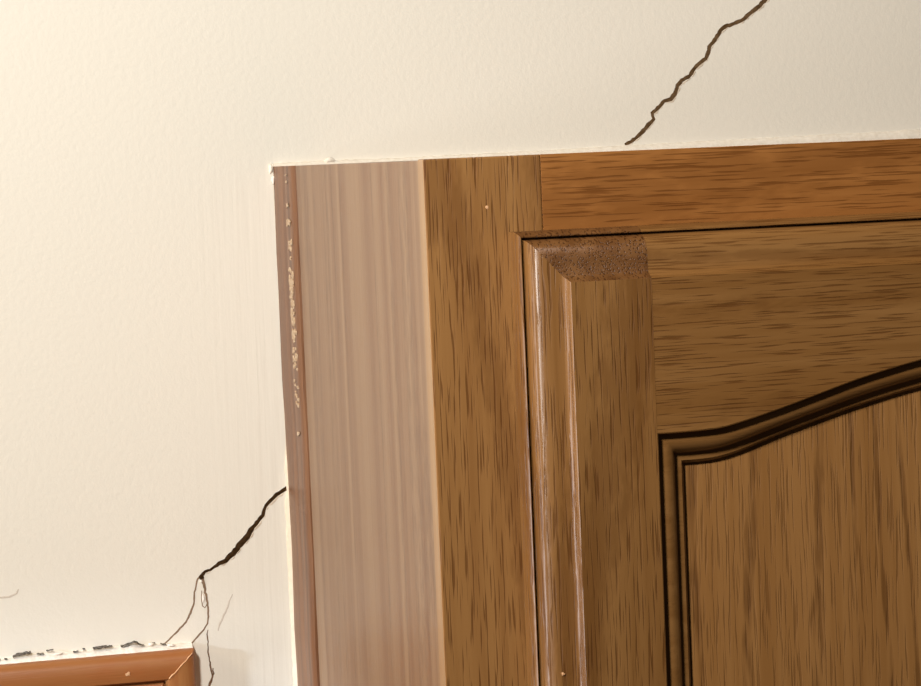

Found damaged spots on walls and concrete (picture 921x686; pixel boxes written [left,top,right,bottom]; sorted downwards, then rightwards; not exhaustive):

crack [625,0,770,145]
crack [165,486,287,686]